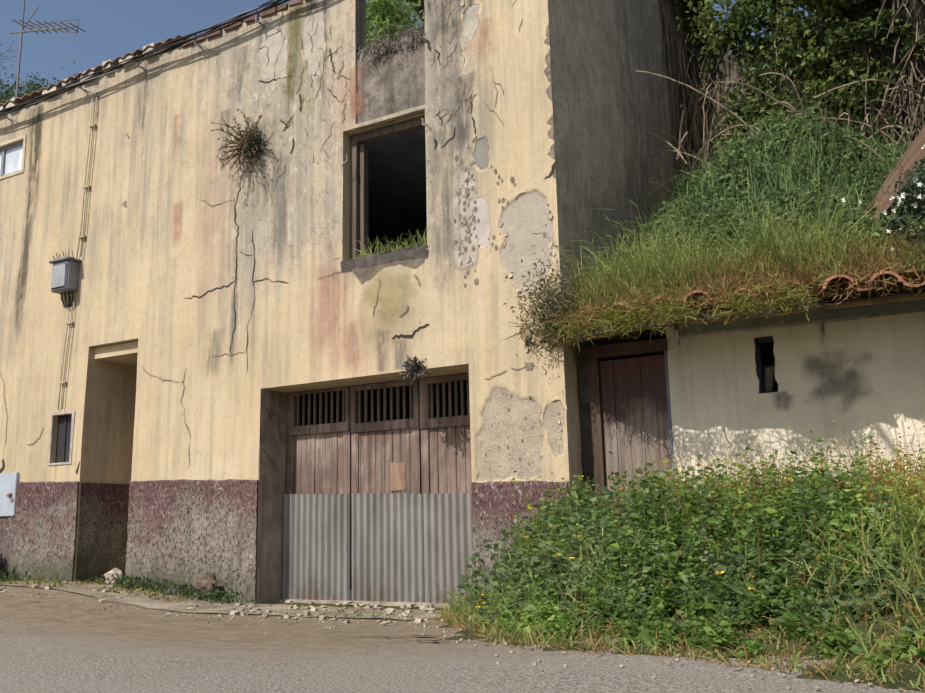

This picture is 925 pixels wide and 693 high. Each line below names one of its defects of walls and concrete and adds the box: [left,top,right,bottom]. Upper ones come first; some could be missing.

water stain [290,1,326,47]
peeling [422,0,483,69]
spalling [544,23,552,100]
peeling [421,79,477,149]
water stain [16,108,41,315]
spalling [452,136,557,295]
crack [185,177,289,370]
crack [392,324,429,339]
crack [142,366,190,467]
spalling [471,387,567,482]
water stain [807,360,859,398]